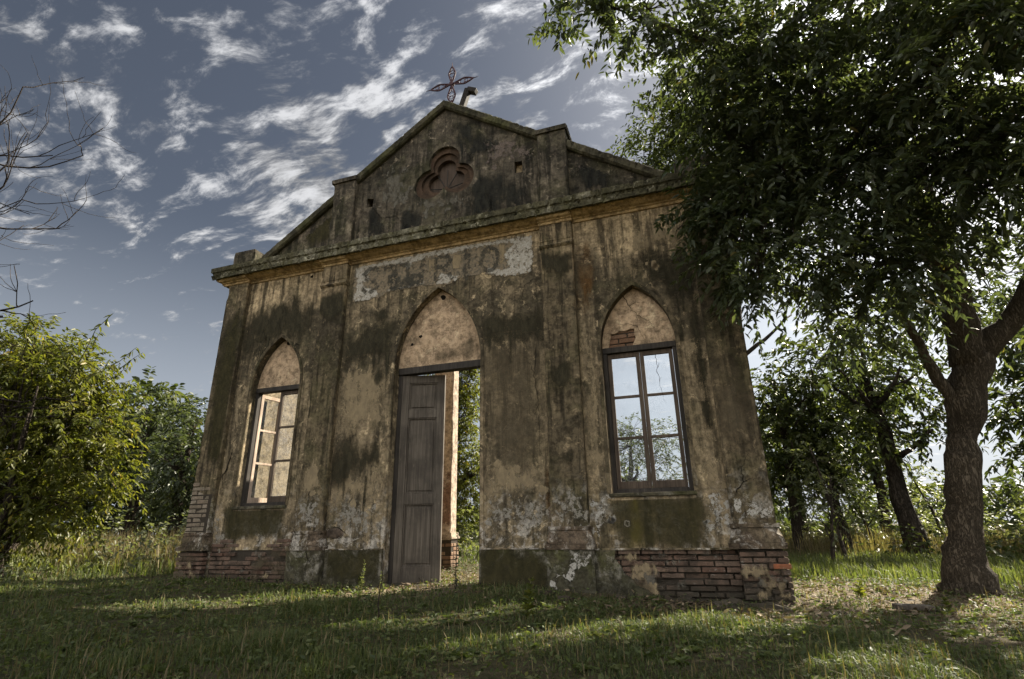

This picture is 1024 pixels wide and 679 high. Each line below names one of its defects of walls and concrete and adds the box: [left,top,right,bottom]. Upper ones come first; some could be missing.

water stain [468,175,525,214]
water stain [368,207,384,236]
water stain [401,210,421,230]
spalling [609,329,636,348]
water stain [331,440,383,512]
peeling [702,492,774,533]
spalling [173,483,292,583]
peeling [550,553,591,588]
spalling [615,549,796,606]